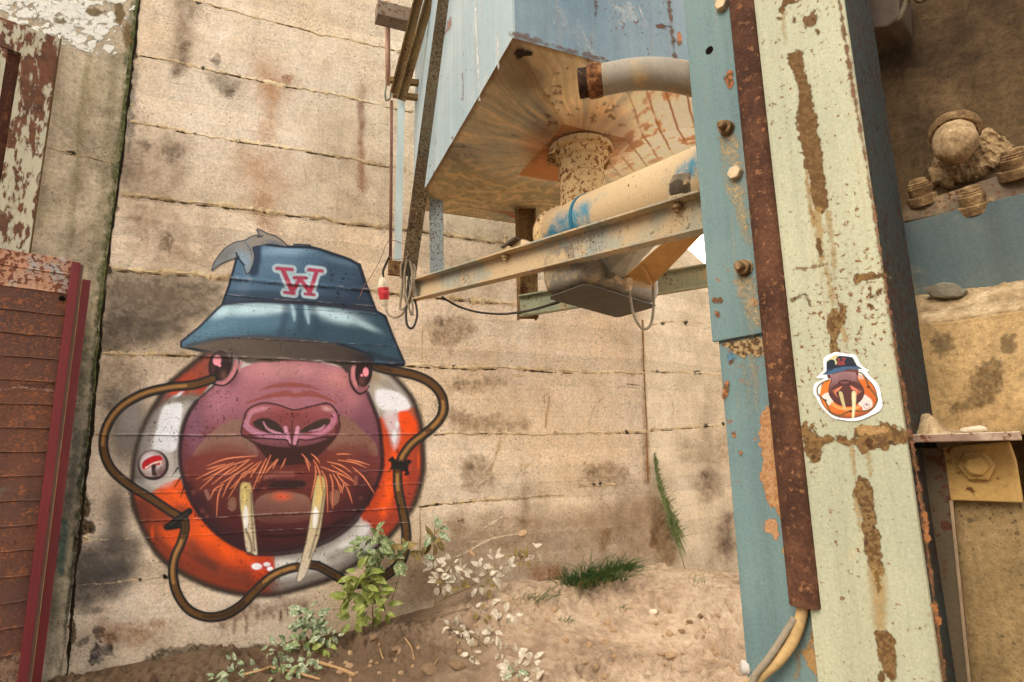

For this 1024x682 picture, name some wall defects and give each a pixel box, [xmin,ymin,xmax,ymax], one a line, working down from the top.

peeling [0,0,135,54]
crack [63,0,141,676]
peeling [758,406,784,554]